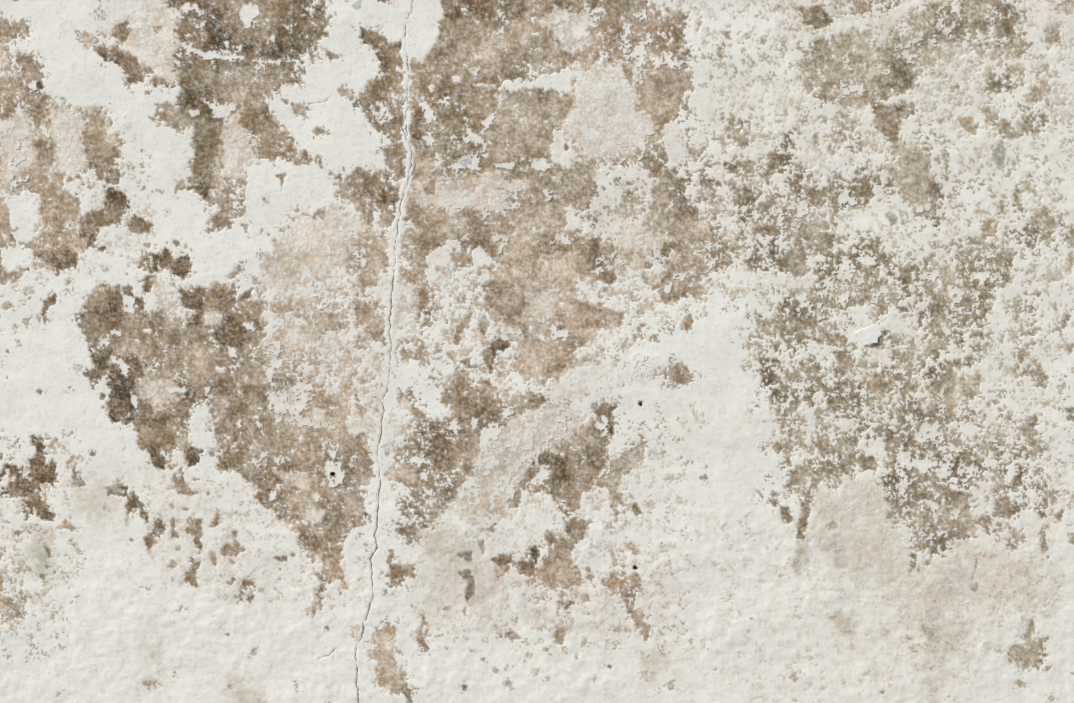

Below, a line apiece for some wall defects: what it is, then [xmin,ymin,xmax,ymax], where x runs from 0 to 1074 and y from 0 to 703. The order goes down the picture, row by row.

peeling [714,30,732,62]
peeling [291,103,327,139]
peeling [0,12,157,298]
peeling [22,290,61,330]
crack [317,1,416,703]
peeling [645,354,705,390]
peeling [1050,502,1071,523]
peeling [0,428,88,662]
peeling [100,476,268,606]
peeling [272,546,303,581]
peeling [385,549,418,589]
peeling [1037,523,1053,558]